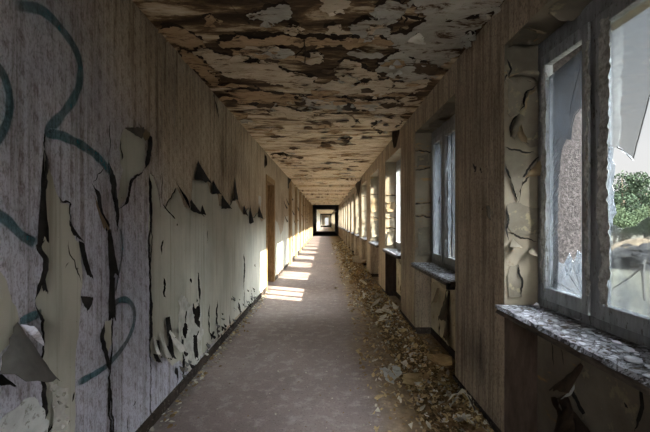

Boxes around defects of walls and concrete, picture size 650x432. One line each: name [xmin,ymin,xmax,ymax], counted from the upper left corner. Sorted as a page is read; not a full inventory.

peeling [157,0,504,184]
peeling [504,44,547,292]
flaking render [153,288,257,383]
peeling [0,382,75,432]
peeling [549,359,650,432]